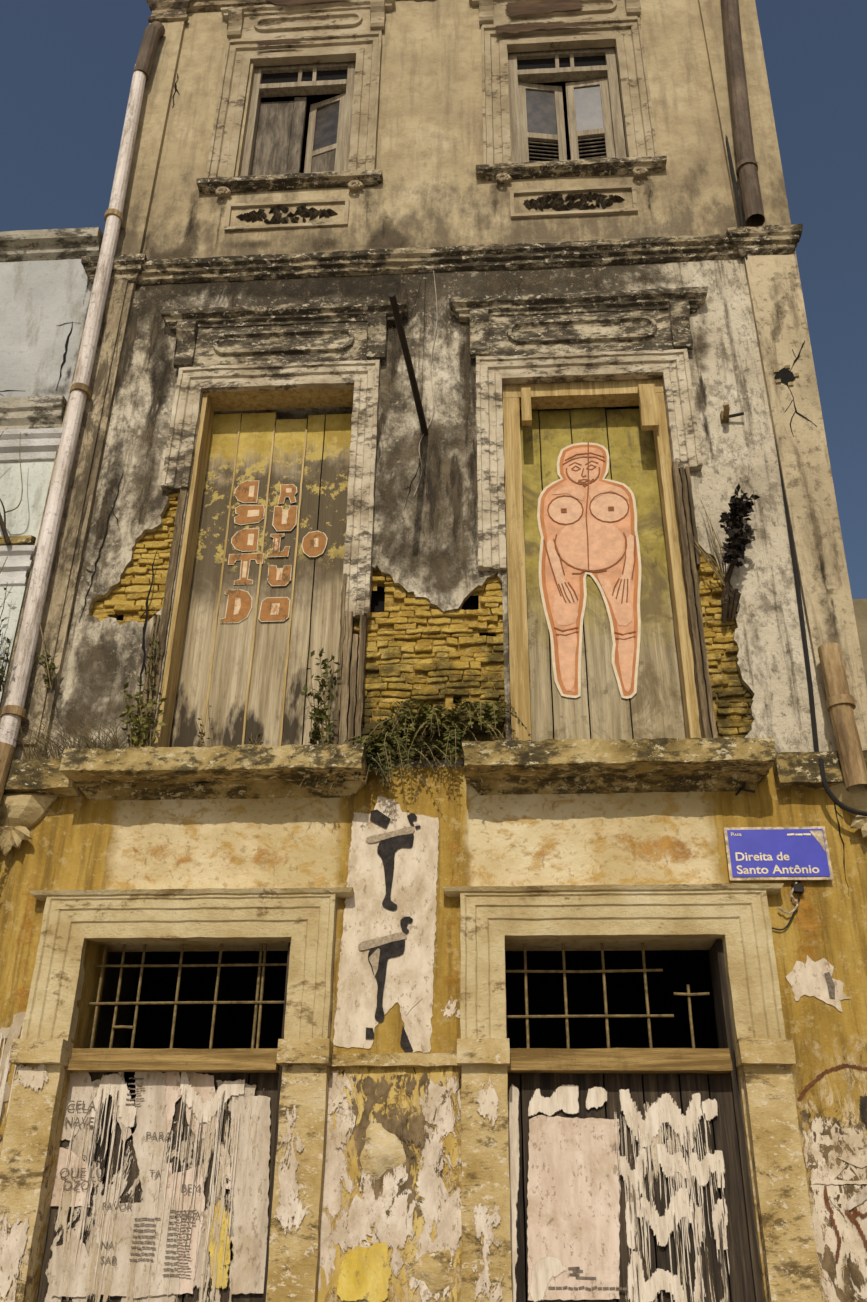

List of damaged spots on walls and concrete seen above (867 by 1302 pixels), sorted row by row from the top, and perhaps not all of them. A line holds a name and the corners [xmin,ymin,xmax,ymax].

leakage [77,274,478,593]
crack [785,341,817,436]
leakage [64,645,137,733]
spalling [91,493,180,625]
spalling [351,569,506,761]
spalling [697,549,753,738]